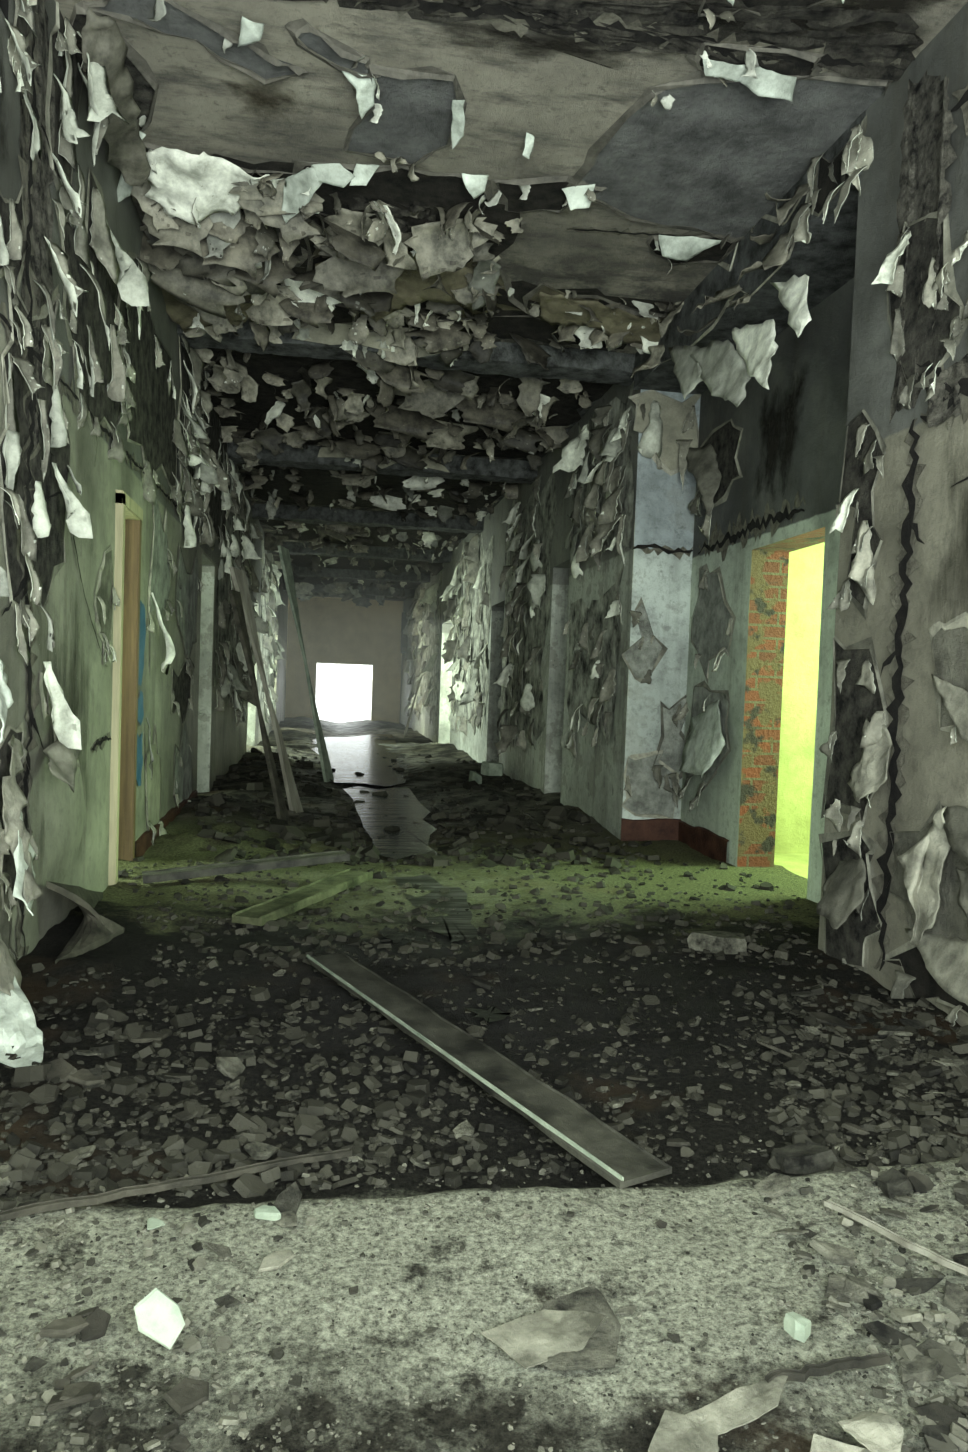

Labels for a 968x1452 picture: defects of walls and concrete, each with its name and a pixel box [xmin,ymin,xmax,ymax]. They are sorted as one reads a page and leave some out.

crack [324,0,906,73]
crack [566,227,720,240]
crack [0,7,185,833]
peeling [0,0,968,1026]
crack [632,491,805,562]
crack [871,360,968,971]
crack [12,889,29,958]